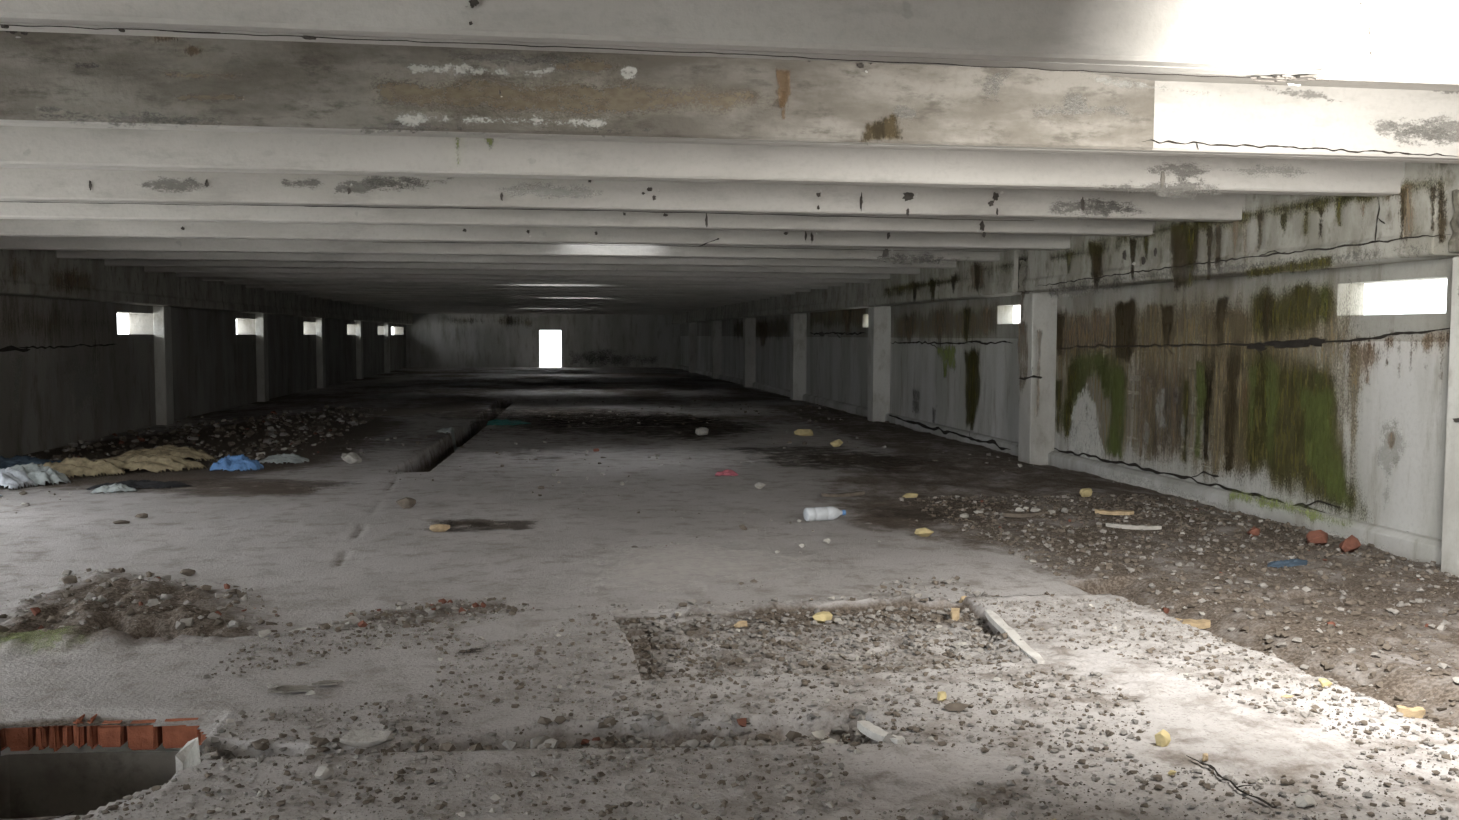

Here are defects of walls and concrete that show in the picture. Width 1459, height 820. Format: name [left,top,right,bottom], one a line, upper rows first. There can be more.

rust [776,70,790,119]
leakage [1376,117,1459,144]
leakage [1050,201,1376,512]